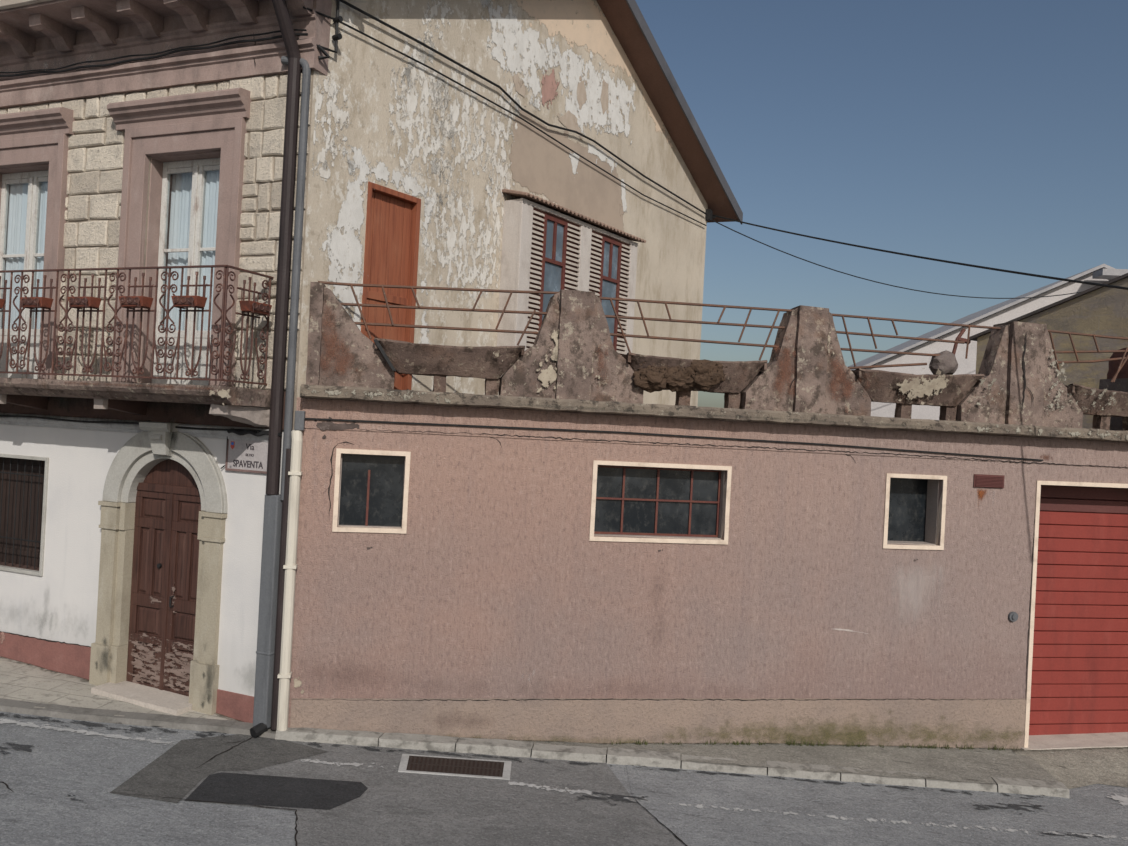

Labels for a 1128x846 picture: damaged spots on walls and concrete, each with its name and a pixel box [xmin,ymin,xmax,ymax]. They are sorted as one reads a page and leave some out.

peeling [312,0,636,344]
spalling [536,330,559,393]
spalling [896,368,949,405]
peeling [127,633,194,694]